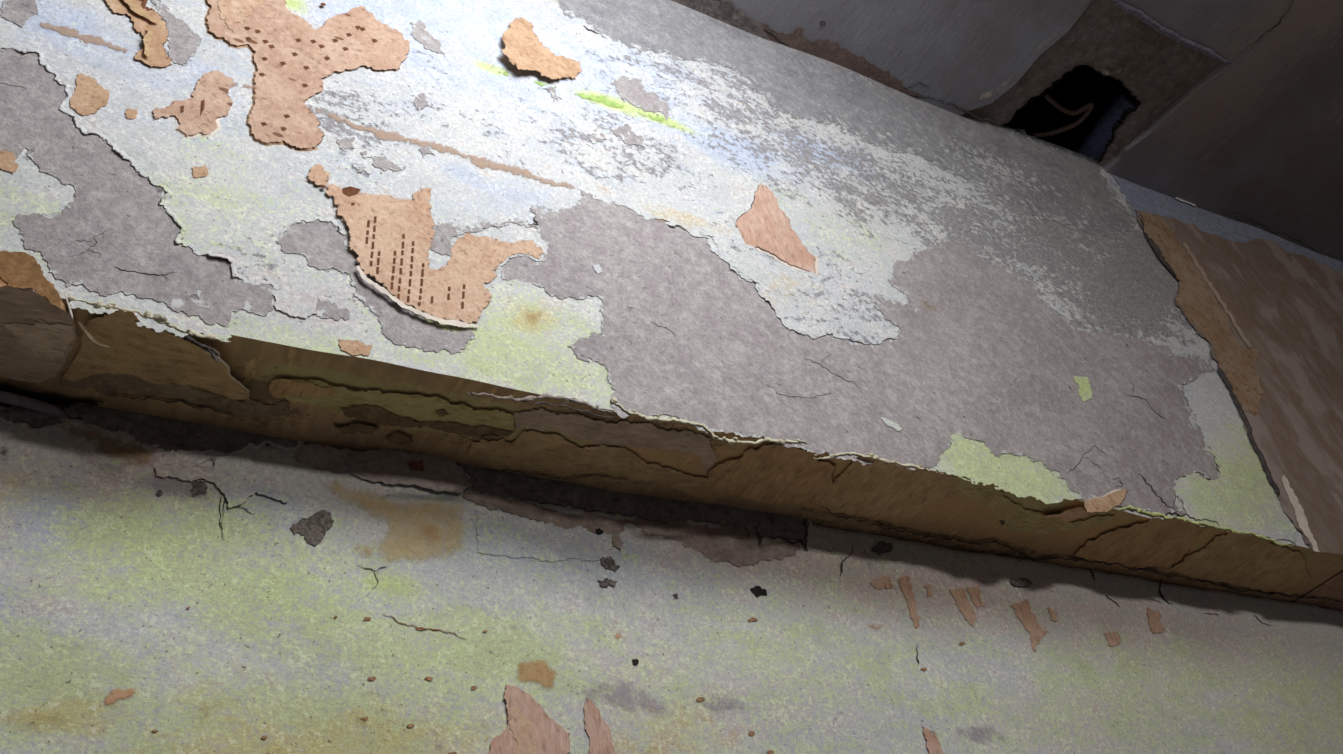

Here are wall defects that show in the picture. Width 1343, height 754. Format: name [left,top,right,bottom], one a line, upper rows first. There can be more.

flaking render [0,0,1296,546]
crack [774,355,856,398]
crack [521,398,614,418]
crack [155,457,252,536]
flaking render [0,404,812,587]
peeling [870,576,933,628]
peeling [949,585,986,626]
peeling [1011,576,1058,651]
peeling [1147,608,1165,634]
peeling [487,685,571,754]
peeling [583,698,615,754]
peeling [923,727,945,754]